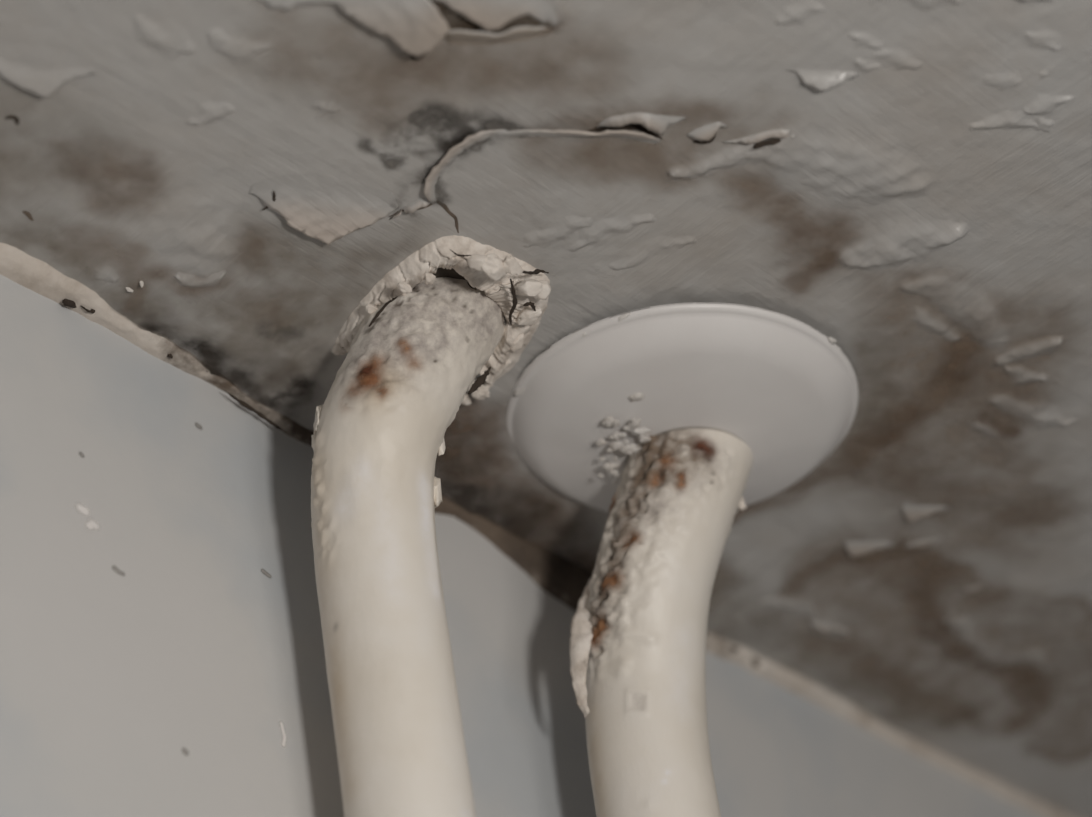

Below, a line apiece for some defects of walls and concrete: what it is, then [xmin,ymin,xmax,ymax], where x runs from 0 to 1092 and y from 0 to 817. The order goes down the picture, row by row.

peeling [258,0,566,61]
mould [409,106,523,155]
crack [488,112,792,149]
mould [360,141,401,169]
peeling [248,173,431,246]
hole [433,267,466,280]
mould [197,342,246,383]
corrosion [357,358,386,396]
corrosion [695,440,714,456]
water stain [436,453,542,535]
peeling [569,575,594,718]
corrosion [591,619,606,644]